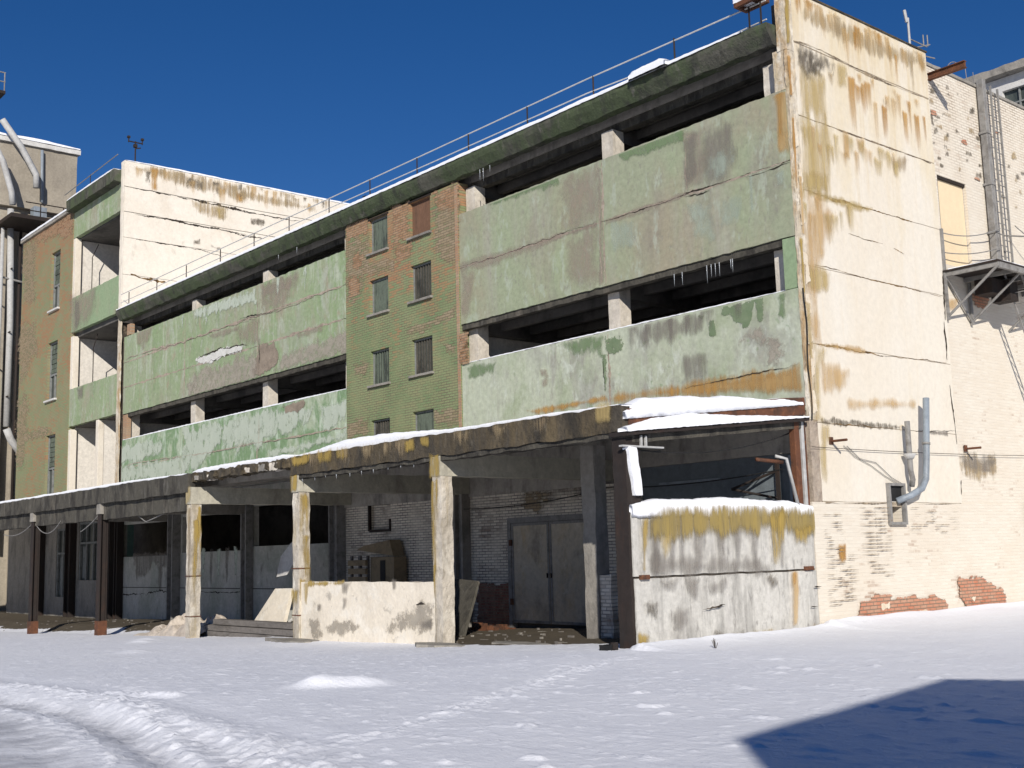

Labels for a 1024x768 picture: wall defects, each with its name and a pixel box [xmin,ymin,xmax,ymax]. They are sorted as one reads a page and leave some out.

rust [785,0,924,70]
rust [848,75,926,132]
crack [135,188,298,256]
crack [808,190,912,253]
crack [131,274,165,283]
crack [813,265,947,363]
spalling [187,321,346,395]
rust [642,365,801,396]
spalling [192,457,292,483]
damp [643,505,815,597]
flaking render [858,593,949,616]
flaking render [958,575,1007,606]